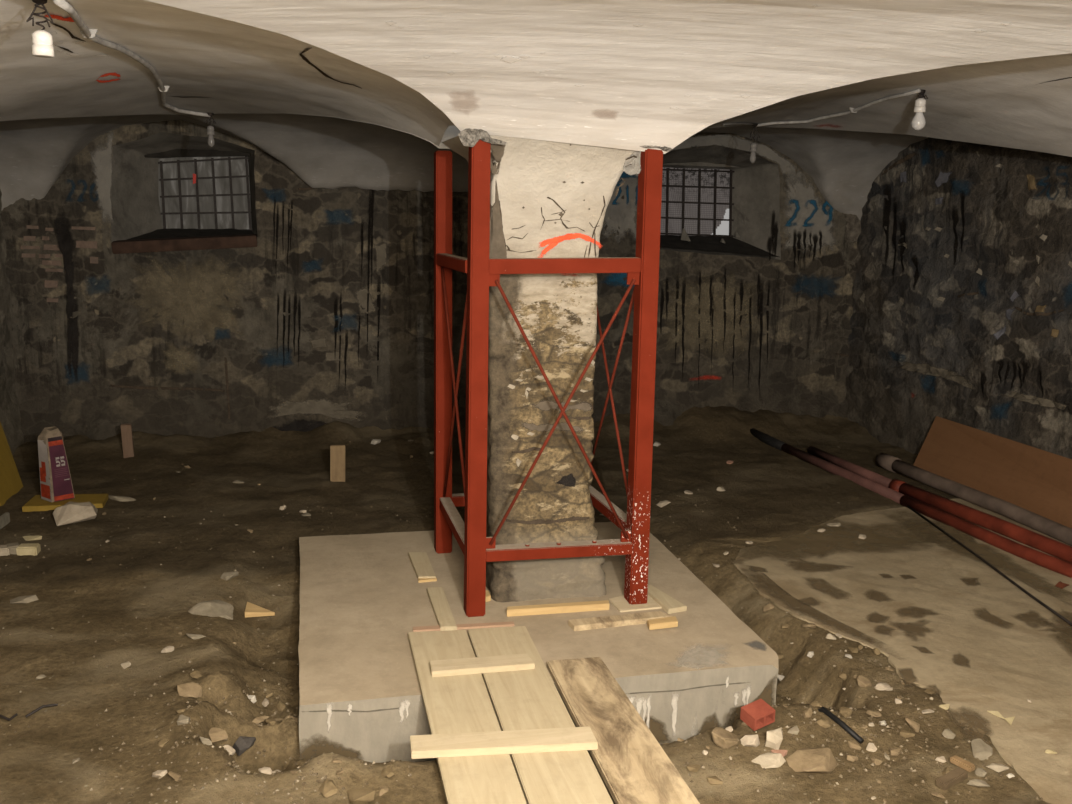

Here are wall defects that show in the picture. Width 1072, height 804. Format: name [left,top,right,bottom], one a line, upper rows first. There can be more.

leakage [273,200,293,271]
flaking render [458,128,507,258]
crack [499,196,605,258]
leakage [793,230,822,268]
leakage [55,215,79,377]
leakage [277,291,301,367]
leakage [660,277,686,378]
leakage [698,269,770,390]
leakage [399,700,410,722]
leakage [629,694,679,744]
leakage [697,677,774,735]